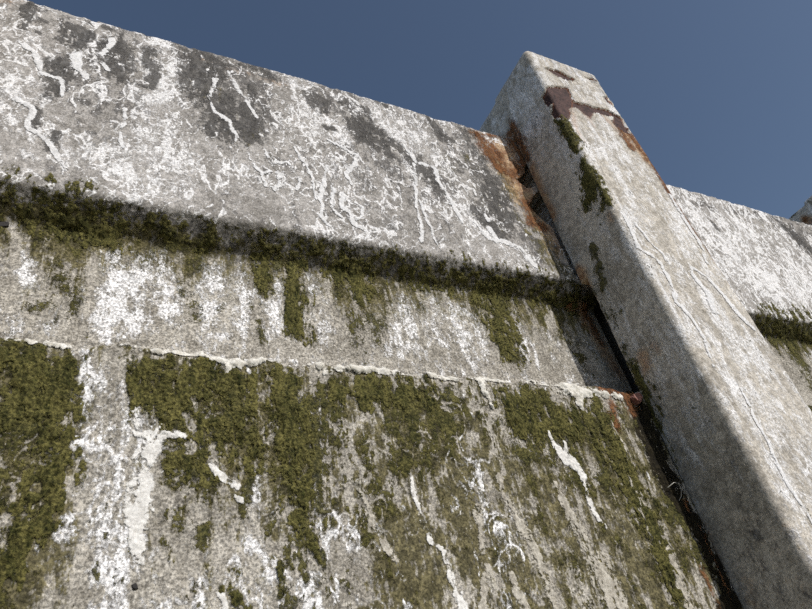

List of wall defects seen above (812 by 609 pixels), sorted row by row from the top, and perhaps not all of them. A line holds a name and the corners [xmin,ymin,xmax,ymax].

damp [30,105,62,152]
damp [17,1,163,101]
damp [174,46,277,145]
rust [470,120,532,182]
rust [520,198,548,232]
damp [117,343,276,373]
damp [295,362,411,375]
damp [122,407,187,565]
damp [203,461,244,503]
damp [410,476,468,609]
damp [496,473,564,609]
damp [521,379,742,609]